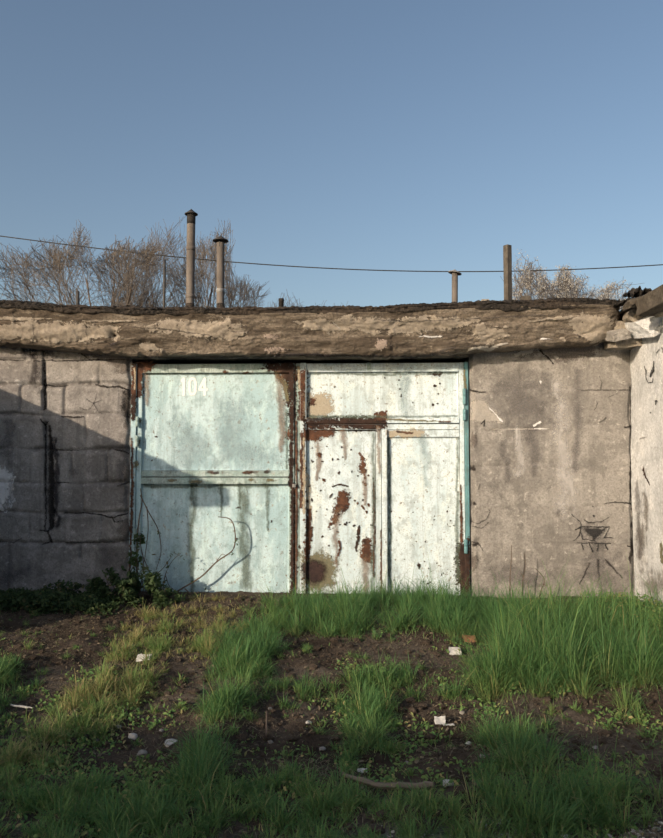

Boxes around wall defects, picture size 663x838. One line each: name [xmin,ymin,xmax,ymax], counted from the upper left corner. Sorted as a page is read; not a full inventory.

peeling [0,315,248,375]
peeling [261,334,290,354]
peeling [293,309,617,364]
rust [129,438,141,571]
leakage [144,482,277,592]
crack [0,324,495,545]
rust [131,360,451,594]
rust [453,484,471,596]